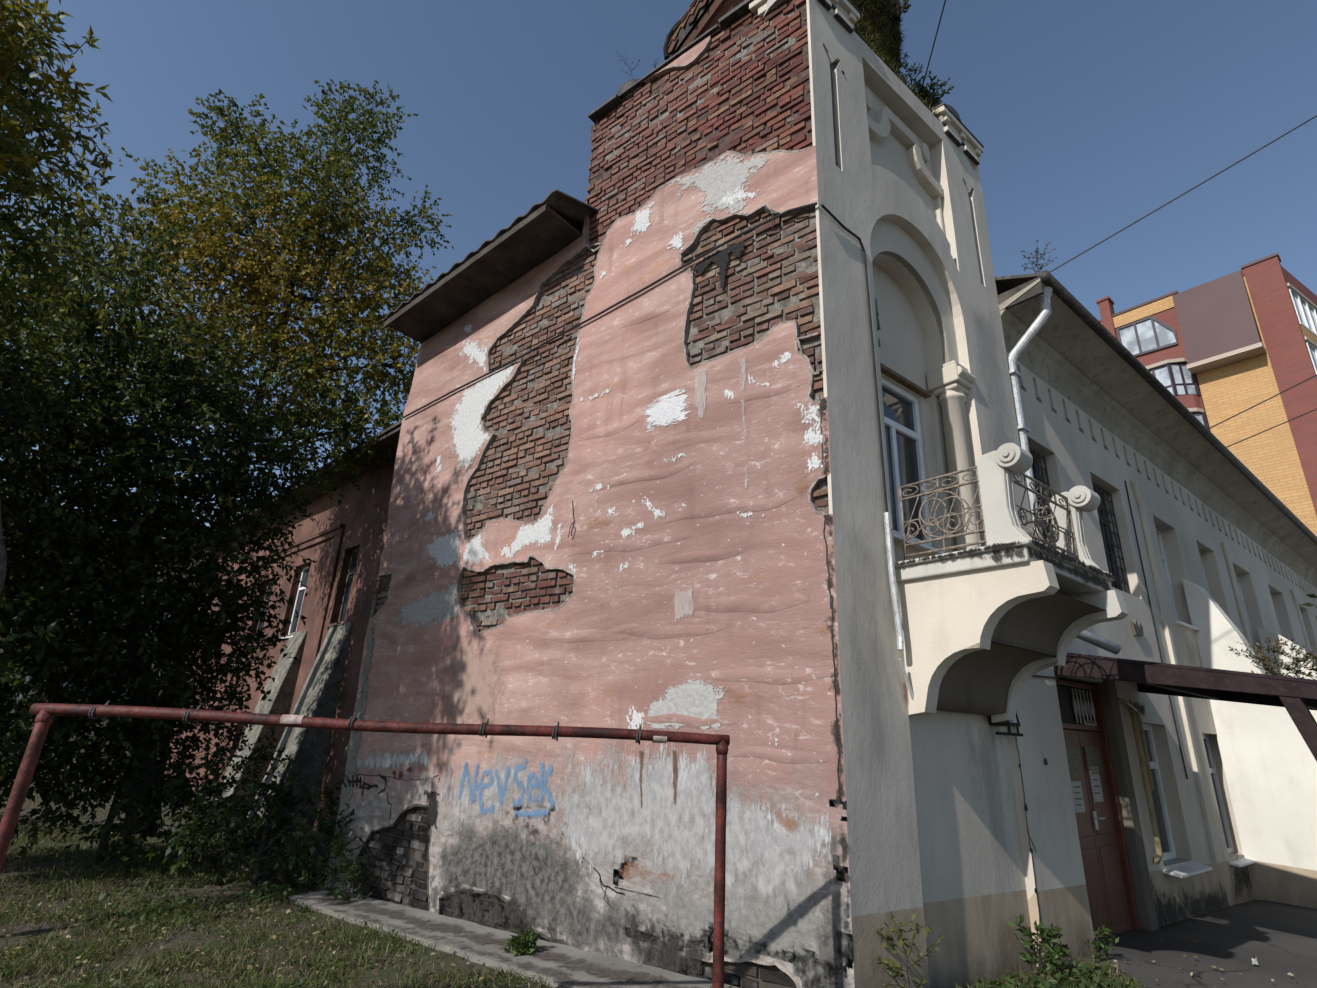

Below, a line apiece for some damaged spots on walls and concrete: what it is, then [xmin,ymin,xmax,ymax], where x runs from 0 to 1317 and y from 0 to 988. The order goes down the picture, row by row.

spalling [426,0,835,636]
spalling [827,609,840,694]
peeling [280,714,306,724]
peeling [331,572,393,850]
peeling [626,706,667,743]
spalling [832,713,844,807]
spalling [353,804,573,947]
leakage [356,743,836,974]
leakage [726,902,848,988]